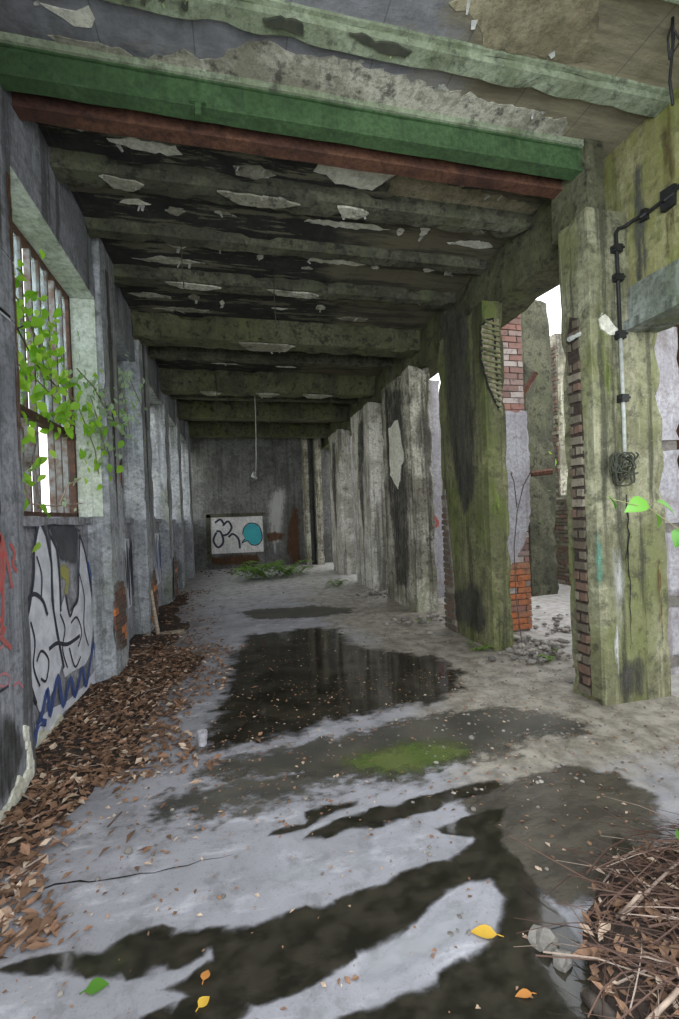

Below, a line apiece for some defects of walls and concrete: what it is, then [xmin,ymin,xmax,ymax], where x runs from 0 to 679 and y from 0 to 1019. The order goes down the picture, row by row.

peeling [107,137,182,156]
peeling [99,174,151,211]
peeling [214,190,300,218]
peeling [304,205,404,236]
peeling [313,164,538,215]
peeling [133,244,205,268]
peeling [447,241,493,249]
peeling [128,281,225,314]
damp [442,310,474,513]
damp [454,582,485,634]
damp [615,630,644,695]
peeling [0,713,64,822]